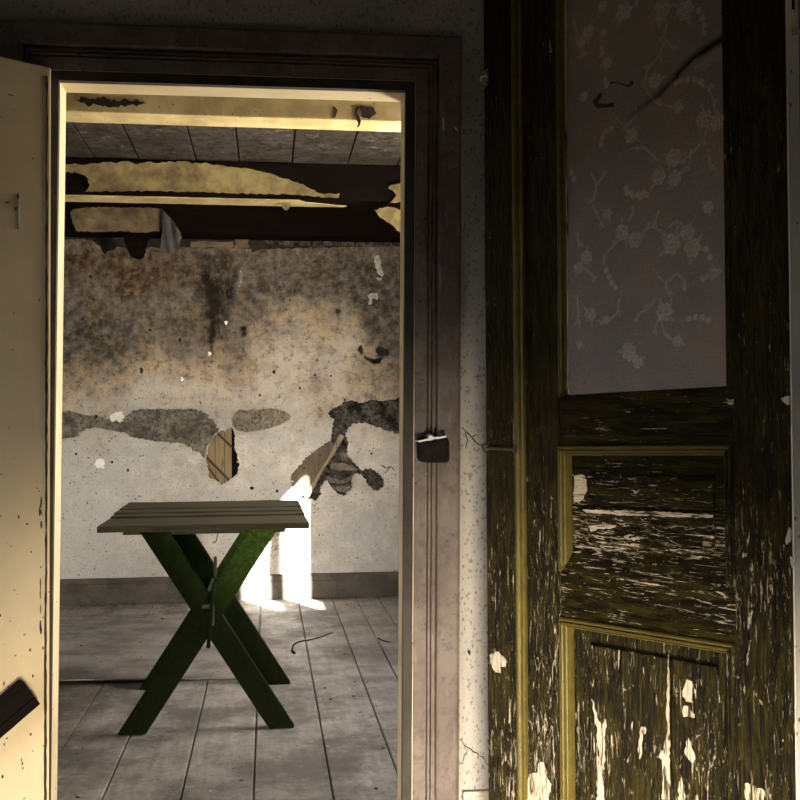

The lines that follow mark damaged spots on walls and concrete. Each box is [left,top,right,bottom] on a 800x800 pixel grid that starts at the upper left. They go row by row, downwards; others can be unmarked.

water stain [63,314,130,364]
water stain [198,252,292,352]
water stain [319,256,400,365]
spalling [62,408,290,485]
spalling [290,397,400,501]
peeling [573,474,713,533]
peeling [489,652,507,673]
peeling [528,762,551,800]
peeling [591,699,607,800]
peeling [657,654,685,800]
peeling [682,679,695,718]
peeling [744,782,765,800]